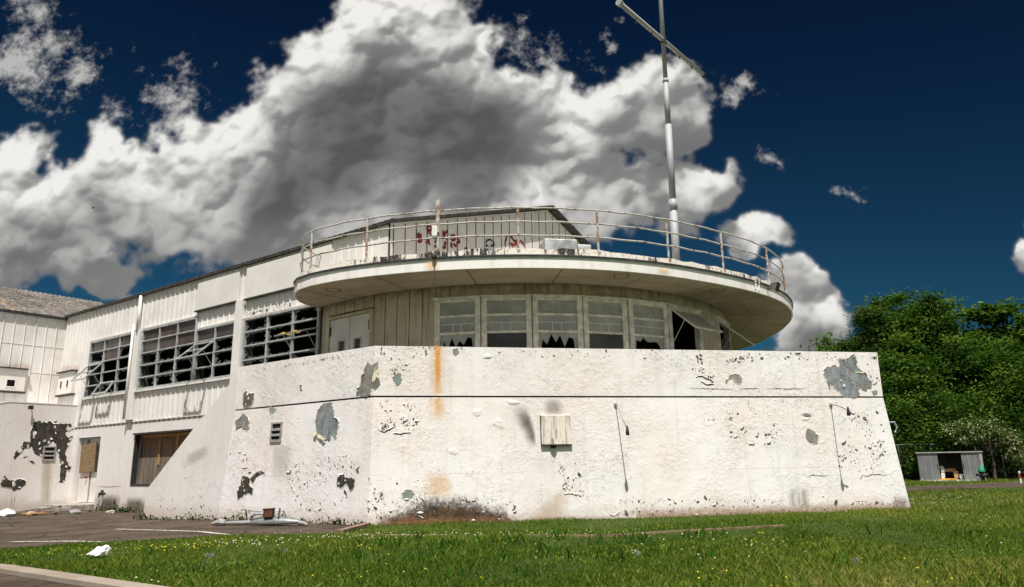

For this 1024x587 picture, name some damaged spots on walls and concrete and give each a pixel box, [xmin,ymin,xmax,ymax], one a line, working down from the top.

peeling [14,419,73,483]
peeling [235,389,255,432]
peeling [313,401,340,441]
peeling [356,347,462,430]
peeling [692,353,770,385]
spalling [802,413,819,445]
peeling [784,352,880,398]
peeling [0,475,26,491]
peeling [230,451,265,516]
peeling [285,455,517,524]